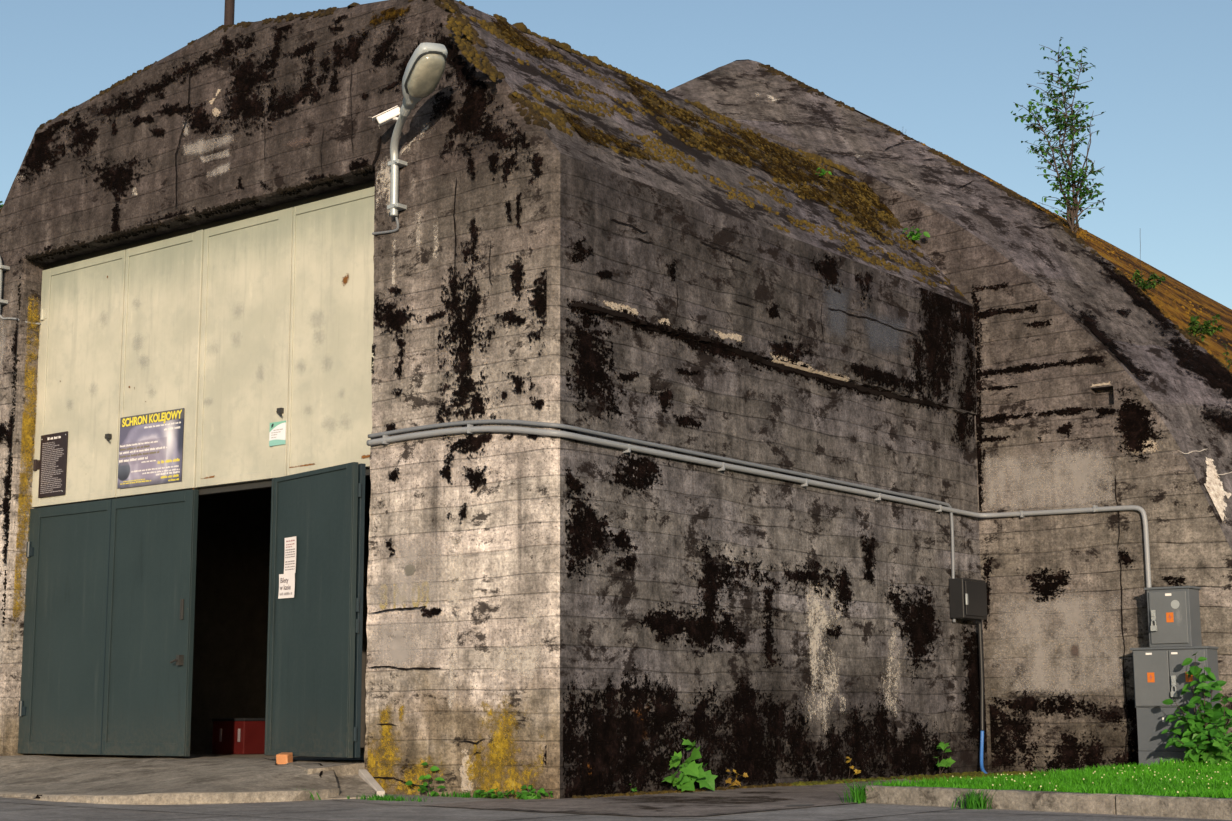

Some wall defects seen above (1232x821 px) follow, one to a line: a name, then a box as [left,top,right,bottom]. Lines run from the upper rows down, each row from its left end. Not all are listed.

damp [184,124,204,162]
crack [367,606,426,614]
crack [367,664,440,672]